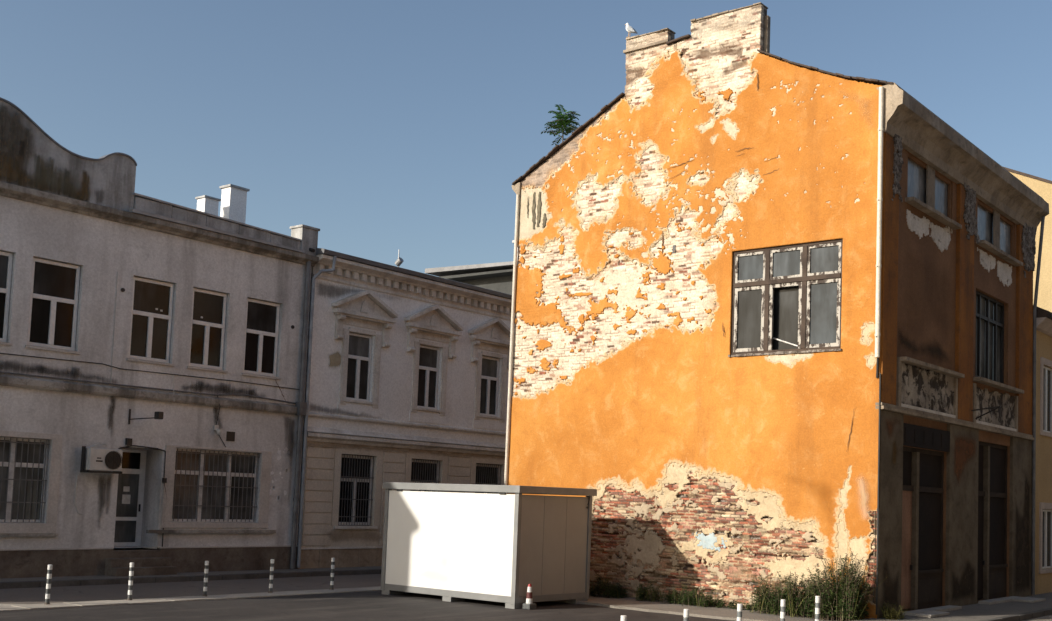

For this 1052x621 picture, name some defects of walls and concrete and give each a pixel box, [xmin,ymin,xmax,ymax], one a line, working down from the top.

water stain [0,106,75,193]
flaking render [512,4,781,399]
flaking render [891,134,953,252]
flaking render [963,183,1037,287]
flaking render [589,462,877,614]